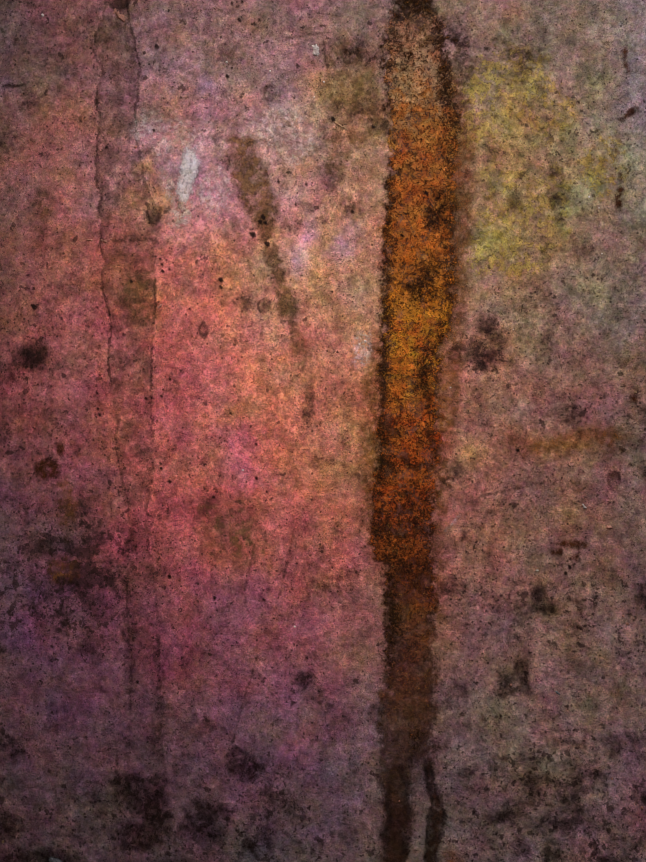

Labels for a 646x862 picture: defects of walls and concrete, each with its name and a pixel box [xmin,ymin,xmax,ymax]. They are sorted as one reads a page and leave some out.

damp [108,0,130,16]
damp [222,136,308,371]
corrosion [361,0,473,862]
damp [115,774,169,850]